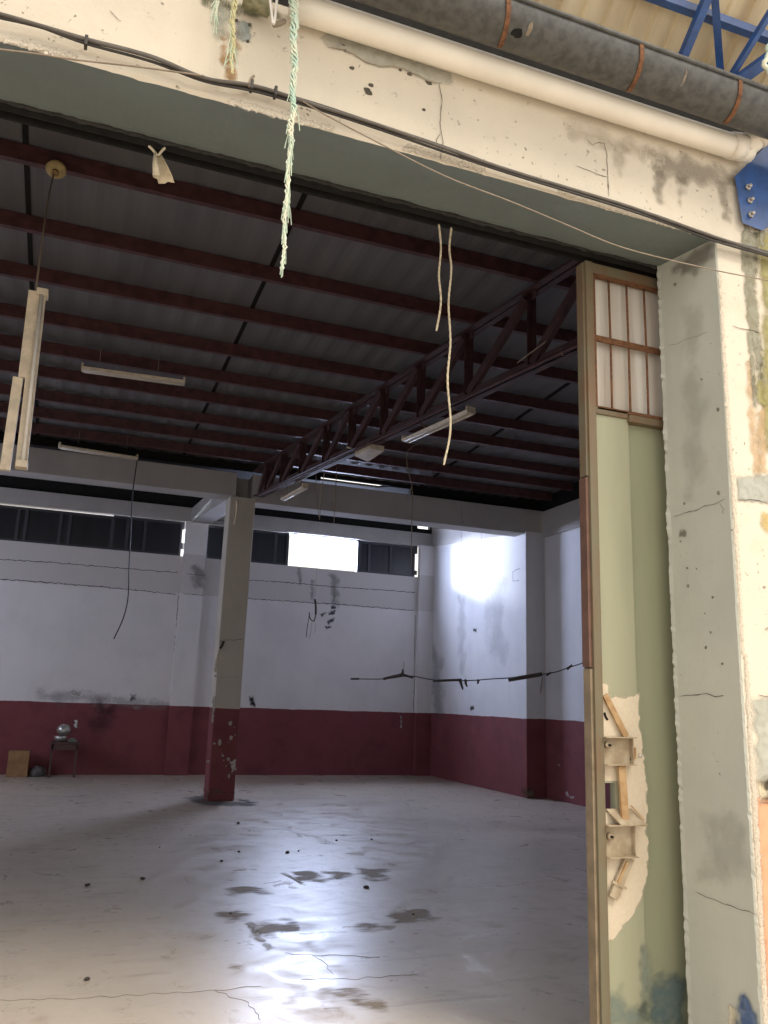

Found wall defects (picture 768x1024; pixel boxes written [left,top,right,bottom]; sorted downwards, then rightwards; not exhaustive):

peeling [322,34,452,85]
water stain [656,155,735,218]
peeling [213,721,237,778]
peeling [603,683,649,941]
crack [285,932,417,980]